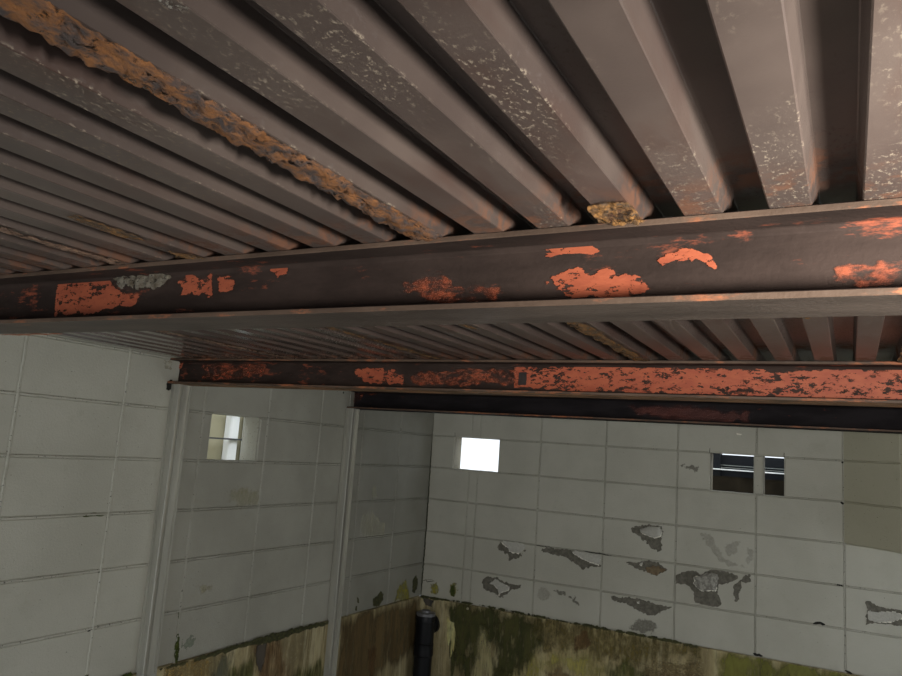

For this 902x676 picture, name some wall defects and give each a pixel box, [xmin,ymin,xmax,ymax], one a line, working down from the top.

corrosion [587,202,644,226]
peeling [497,540,526,561]
peeling [541,547,601,570]
peeling [626,560,667,576]
peeling [482,576,521,598]
peeling [676,570,751,607]
peeling [611,596,671,616]
peeling [865,601,902,626]
water stain [447,603,544,676]
water stain [719,653,846,676]